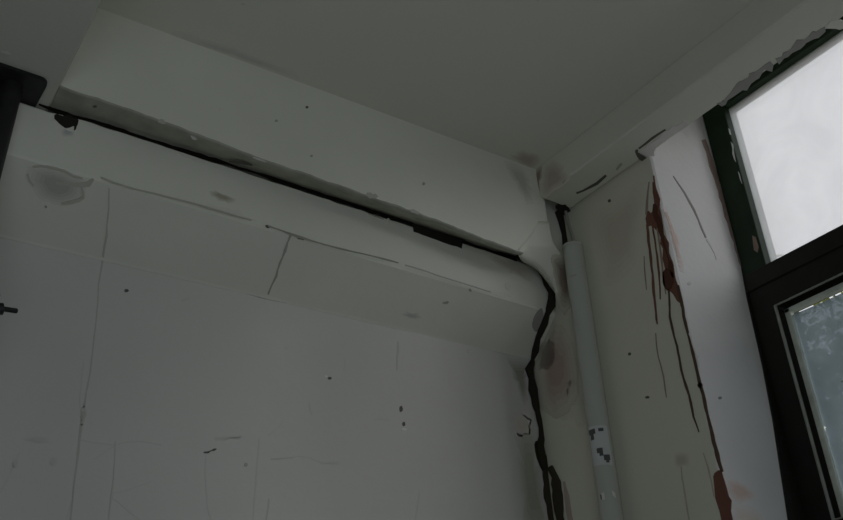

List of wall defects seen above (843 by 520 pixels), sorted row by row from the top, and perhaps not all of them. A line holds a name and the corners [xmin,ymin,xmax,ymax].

spalling [717,19,843,106]
crack [39,104,413,226]
corrosion [644,176,681,324]
corrosion [702,139,741,266]
crack [27,165,491,520]
crack [461,240,564,520]
corrosion [703,452,733,520]